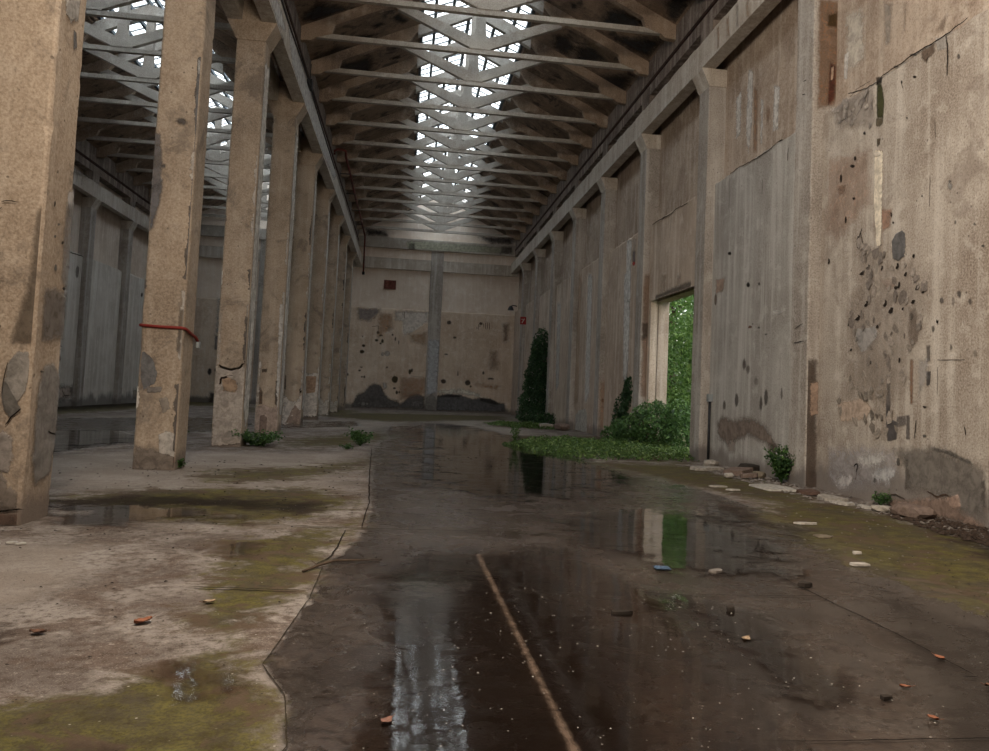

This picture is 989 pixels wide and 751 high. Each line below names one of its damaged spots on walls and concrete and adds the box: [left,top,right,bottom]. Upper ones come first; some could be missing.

peeling [836,236,928,438]
water stain [352,340,505,412]
water stain [743,360,768,409]
water stain [717,394,777,453]
water stain [886,376,989,527]